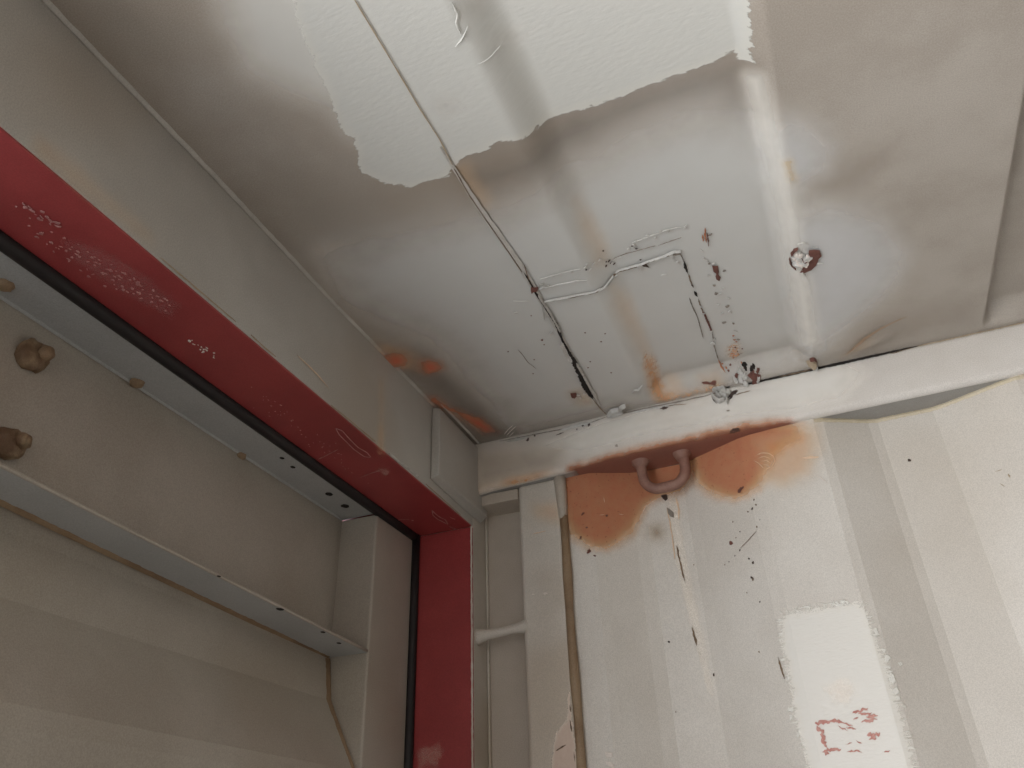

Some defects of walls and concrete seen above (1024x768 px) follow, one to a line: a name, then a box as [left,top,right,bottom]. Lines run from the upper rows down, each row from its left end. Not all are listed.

crack [454,169,1024,442]
corrosion [566,419,811,557]